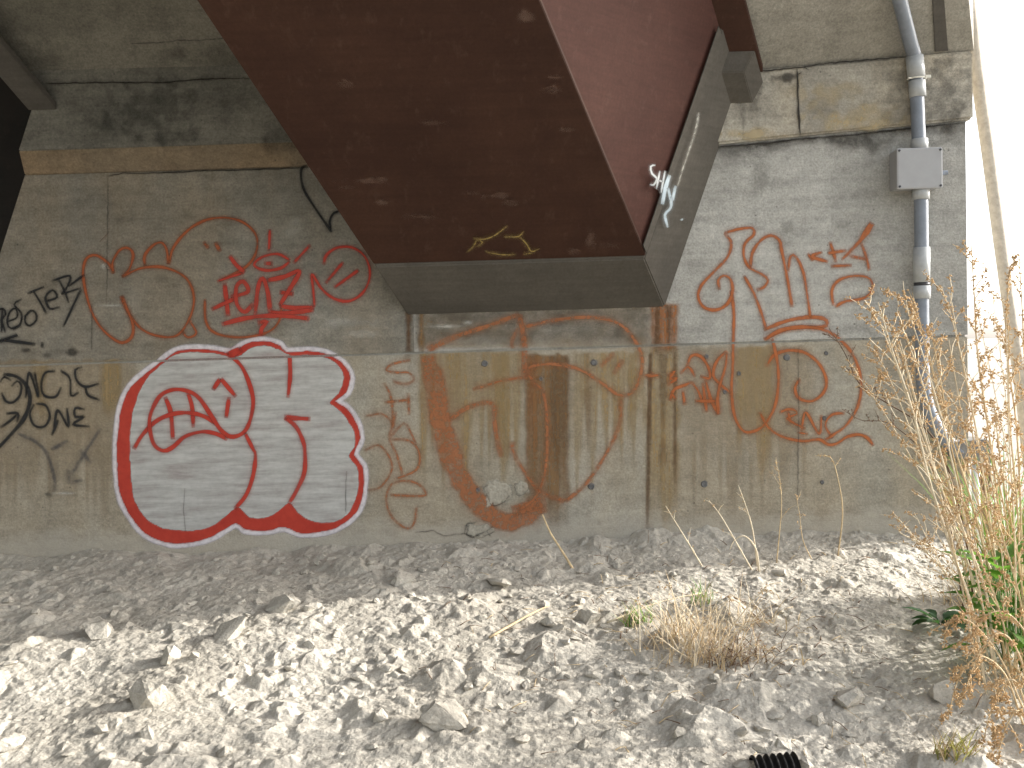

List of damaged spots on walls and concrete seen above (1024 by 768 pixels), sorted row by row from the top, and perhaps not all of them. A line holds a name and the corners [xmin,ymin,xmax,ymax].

corrosion [525,353,569,508]
corrosion [647,304,679,504]